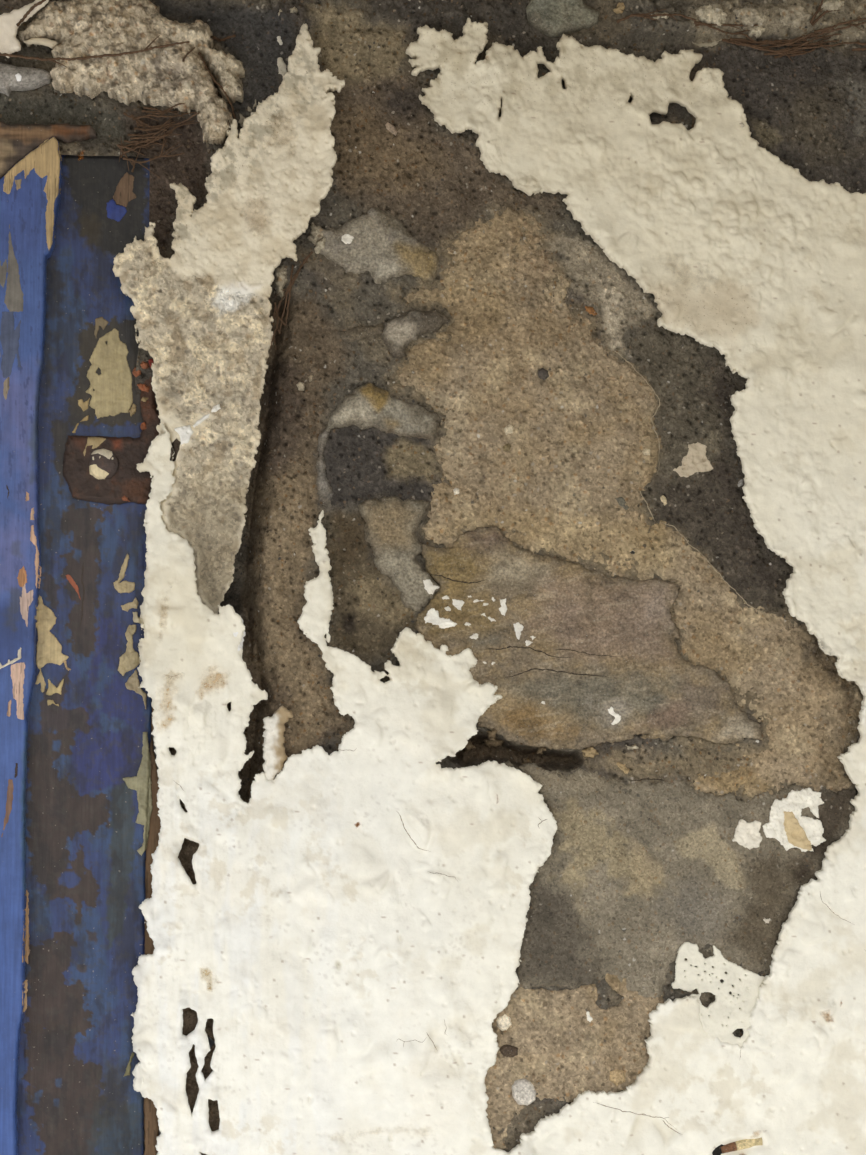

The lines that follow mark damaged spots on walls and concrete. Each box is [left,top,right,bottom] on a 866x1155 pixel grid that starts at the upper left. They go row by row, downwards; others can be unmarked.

spalling [0,0,245,250]
peeling [0,224,24,400]
peeling [78,317,133,419]
flaking render [112,24,345,614]
spalling [150,0,866,803]
peeling [0,492,71,720]
peeling [114,554,147,709]
peeling [1,763,18,837]
peeling [123,732,153,856]
spalling [178,838,199,884]
spalling [436,686,857,1152]
spalling [182,1008,220,1131]